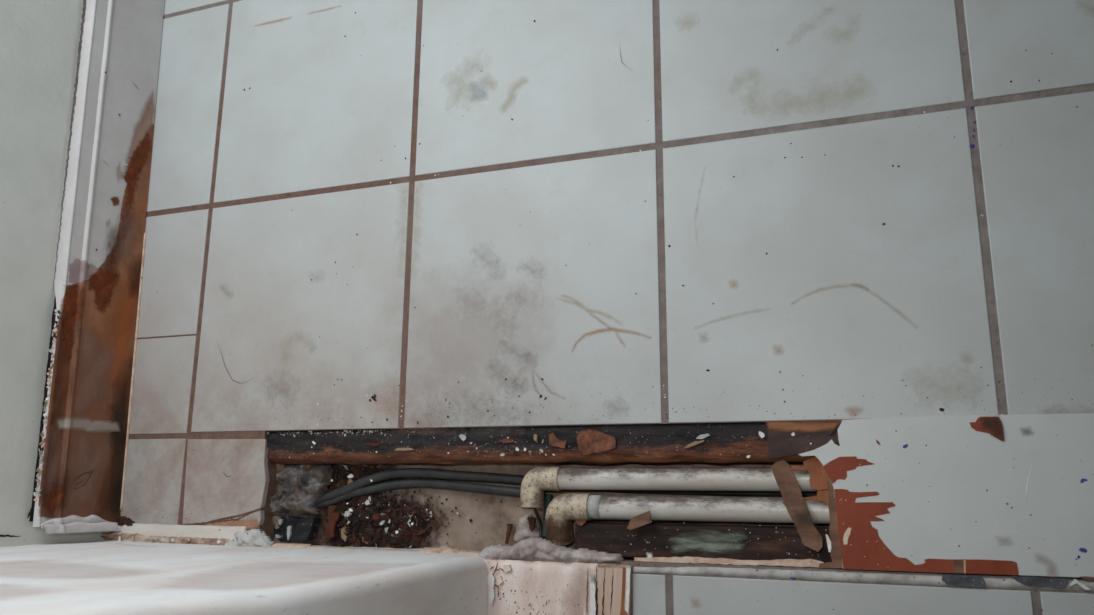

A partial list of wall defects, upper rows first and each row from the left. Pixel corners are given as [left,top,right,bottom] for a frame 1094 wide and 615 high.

peeling [33,124,230,545]
peeling [969,417,1005,441]
peeling [275,519,292,540]
peeling [824,456,1091,590]